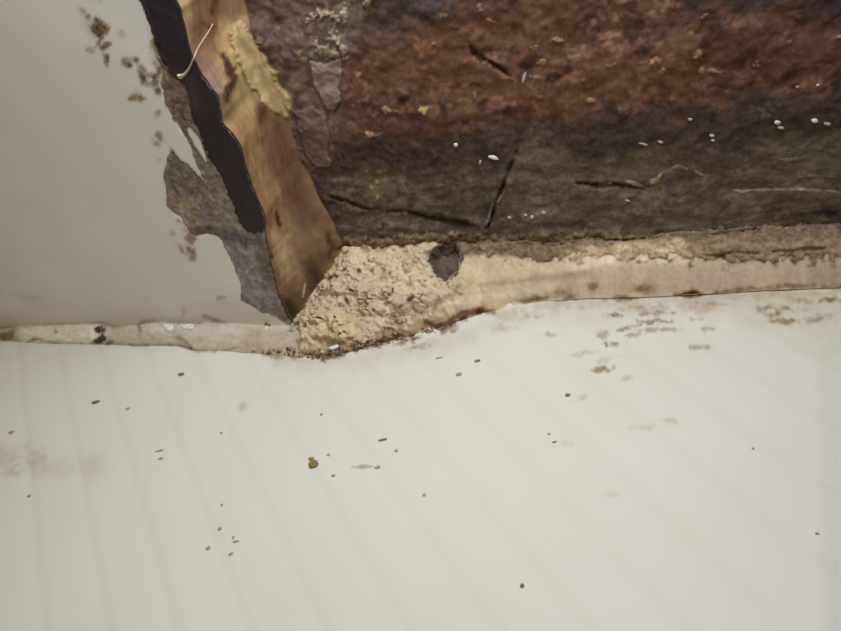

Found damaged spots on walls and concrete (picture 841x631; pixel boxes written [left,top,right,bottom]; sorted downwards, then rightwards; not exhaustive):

leakage [92,18,109,63]
leakage [295,0,372,62]
leakage [221,53,237,100]
crack [386,148,518,228]
spalling [140,0,841,353]
leakage [734,143,841,193]
leakage [282,298,297,320]